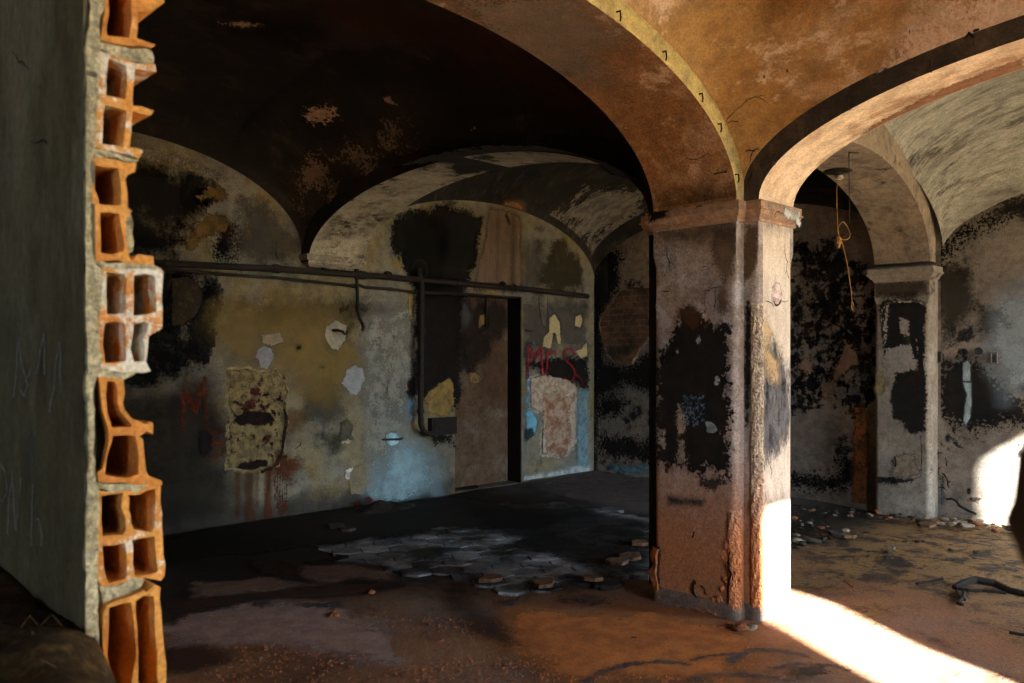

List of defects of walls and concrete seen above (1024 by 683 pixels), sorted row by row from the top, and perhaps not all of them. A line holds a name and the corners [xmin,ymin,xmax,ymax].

crack [725,95,768,126]
peeling [275,96,436,237]
flaking render [599,287,673,367]
spalling [224,332,292,475]
peeling [424,377,456,417]
spalling [527,373,578,459]
leakage [654,403,686,466]
spalling [676,276,782,616]
leakage [851,404,869,504]
leakage [963,361,972,425]
peeling [649,546,661,598]